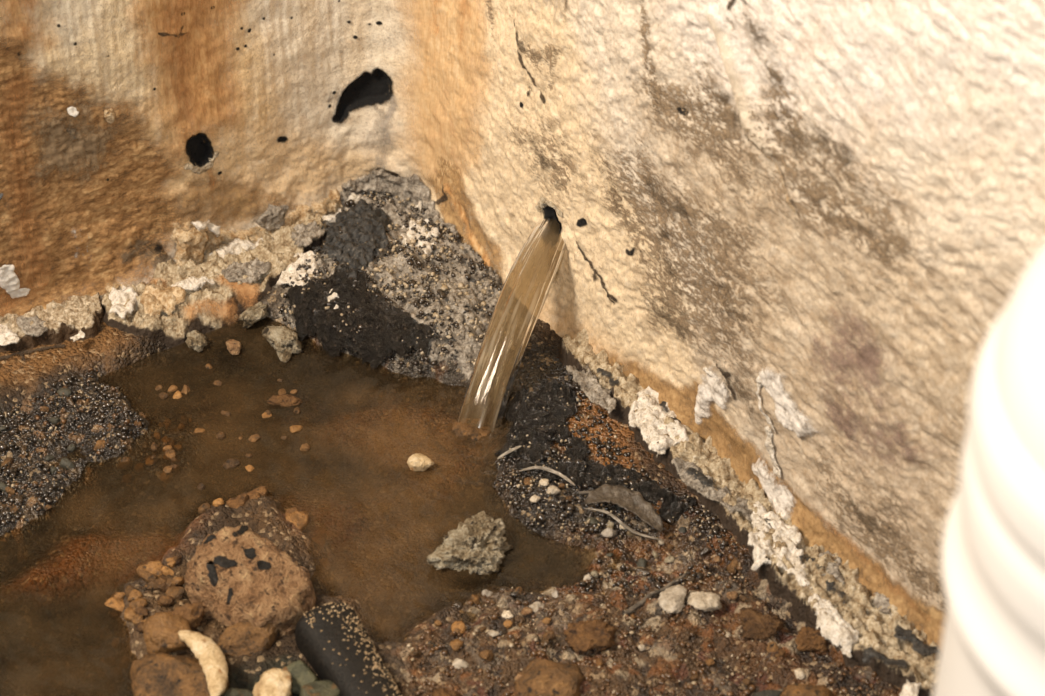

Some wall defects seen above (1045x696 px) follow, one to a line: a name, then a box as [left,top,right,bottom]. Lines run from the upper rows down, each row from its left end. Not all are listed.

corrosion [0,0,33,44]
spalling [0,38,219,318]
corrosion [138,0,237,151]
damp [517,40,559,69]
damp [517,122,574,192]
damp [639,0,933,279]
damp [0,163,530,388]
crack [576,241,617,304]
damp [558,149,948,696]